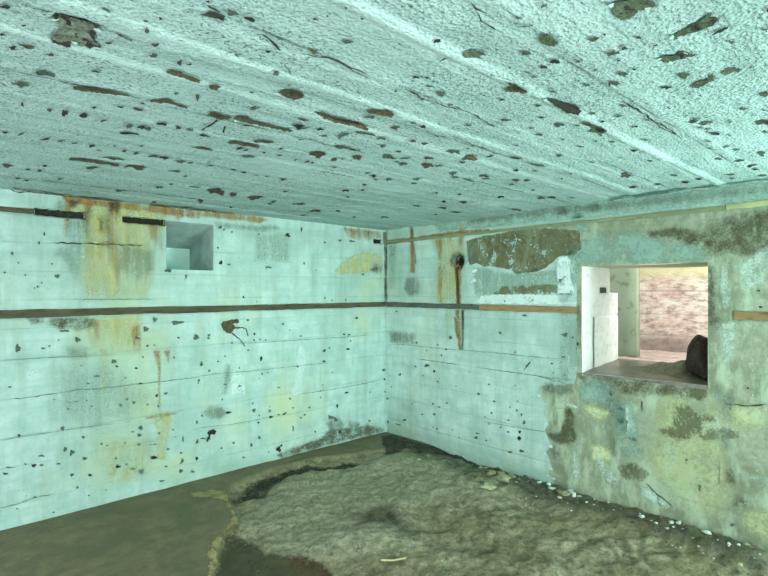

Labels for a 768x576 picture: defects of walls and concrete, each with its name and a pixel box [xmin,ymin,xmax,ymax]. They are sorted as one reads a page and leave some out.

spalling [43,12,132,49]
spalling [608,0,657,20]
spalling [670,14,728,40]
corrosion [64,196,264,294]
water stain [340,232,394,305]
corrosion [383,229,489,349]
water stain [436,179,768,298]
water stain [708,266,736,362]
peeling [466,206,768,551]
water stain [279,421,378,458]